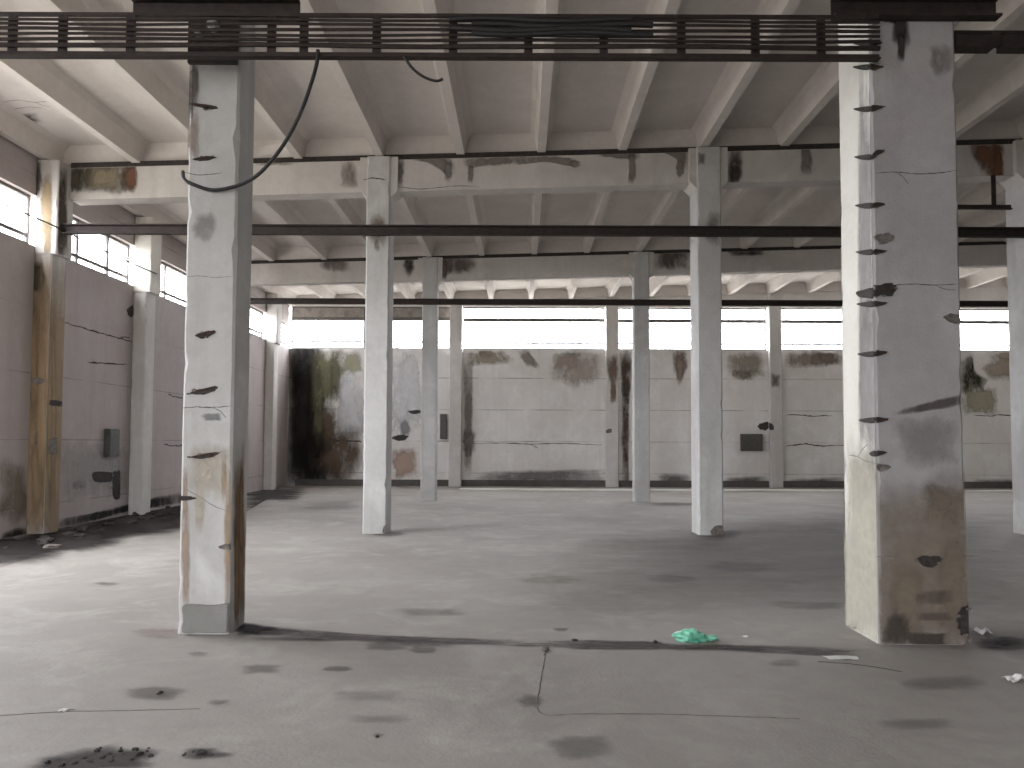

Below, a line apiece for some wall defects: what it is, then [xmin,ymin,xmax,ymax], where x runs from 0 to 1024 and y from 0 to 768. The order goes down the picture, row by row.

rust [125,167,137,189]
rust [974,145,1003,176]
crack [65,322,132,365]
damp [471,351,506,364]
spalling [186,386,218,395]
damp [247,349,361,508]
damp [463,380,474,465]
crack [474,441,595,449]
crack [788,443,877,464]
rust [222,466,245,619]
damp [879,498,969,645]
spalling [956,604,972,641]